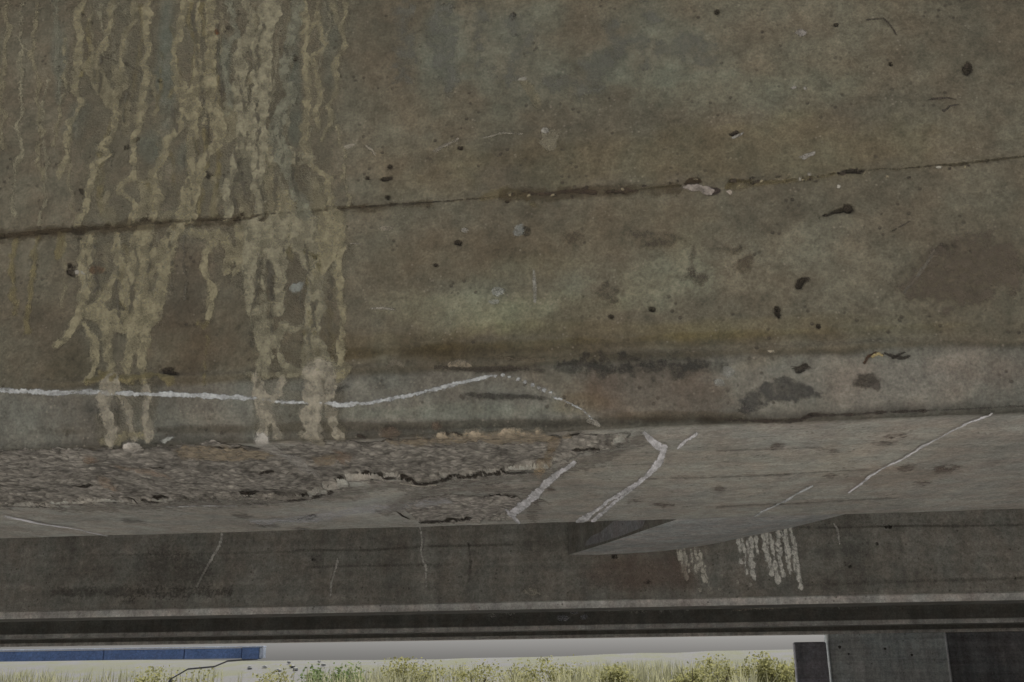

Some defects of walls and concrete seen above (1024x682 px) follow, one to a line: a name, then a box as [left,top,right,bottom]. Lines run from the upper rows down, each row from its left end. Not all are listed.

crack [726,156,1024,190]
water stain [14,0,351,449]
crack [0,185,681,239]
water stain [740,376,820,413]
spalling [0,419,630,524]
efflorescence [676,546,722,592]
efflorescence [736,527,803,590]